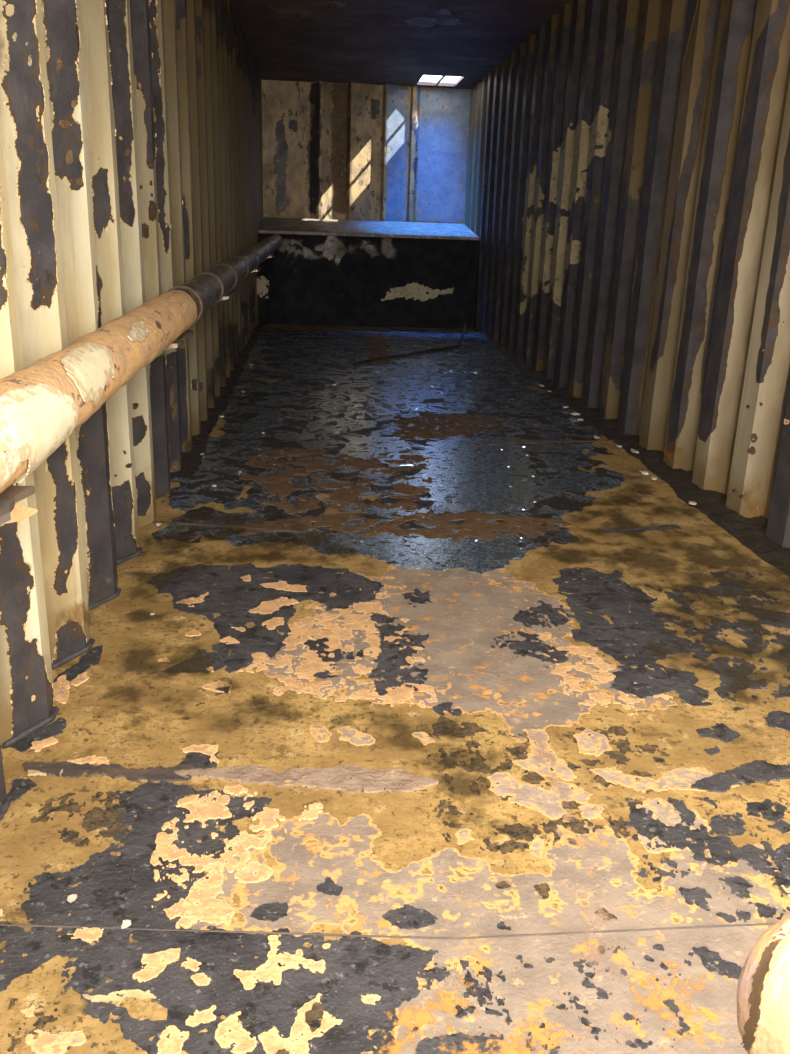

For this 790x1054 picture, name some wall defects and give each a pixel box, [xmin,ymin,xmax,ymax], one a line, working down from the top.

peeling [0,0,190,310]
damp [207,285,255,401]
peeling [45,0,790,674]
peeling [0,503,109,803]
peeling [175,744,219,769]
peeling [552,567,790,708]
peeling [696,723,741,755]
peeling [764,711,790,731]
peeling [0,780,438,1054]
peeling [708,799,790,898]